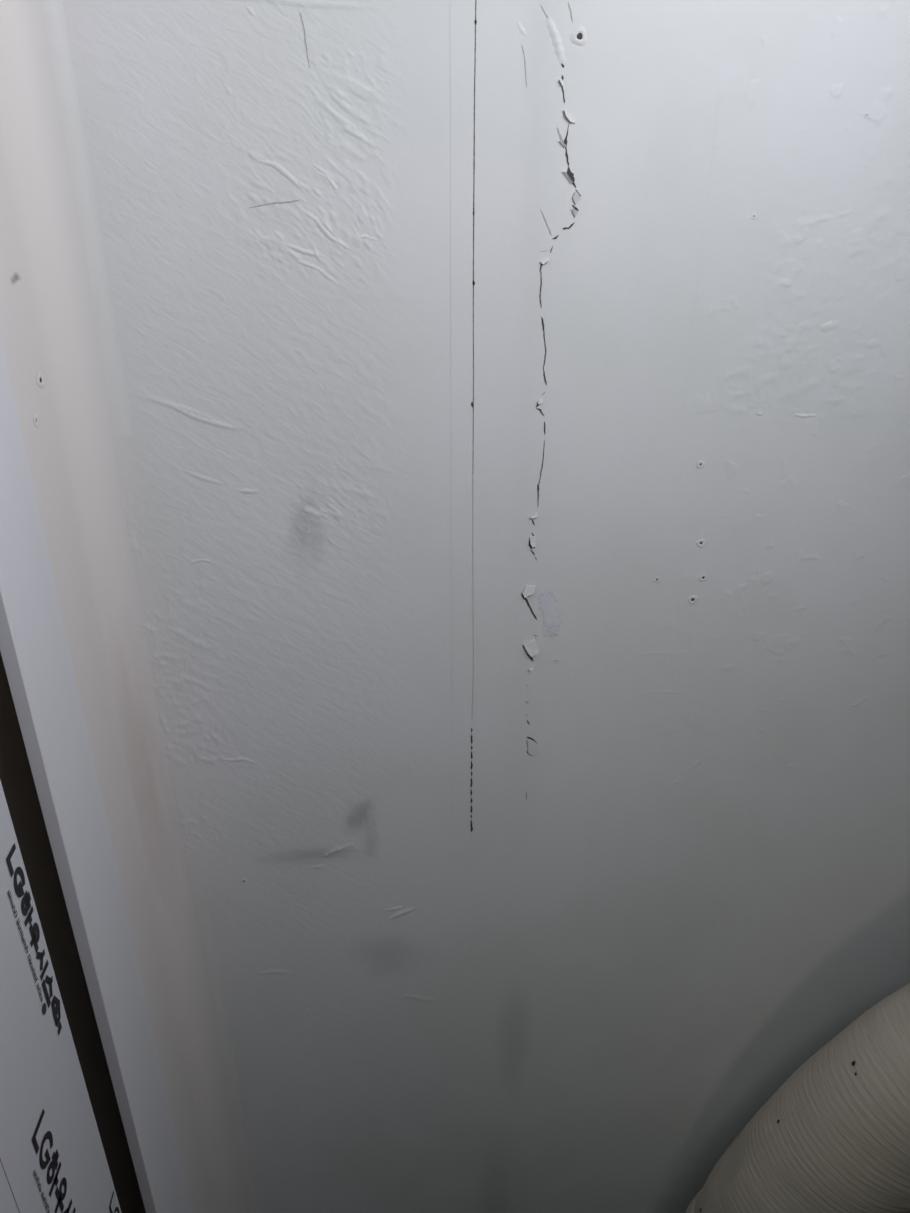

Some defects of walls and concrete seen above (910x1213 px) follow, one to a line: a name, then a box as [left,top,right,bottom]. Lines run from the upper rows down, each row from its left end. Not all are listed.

crack [516,3,581,671]
crack [526,701,540,756]